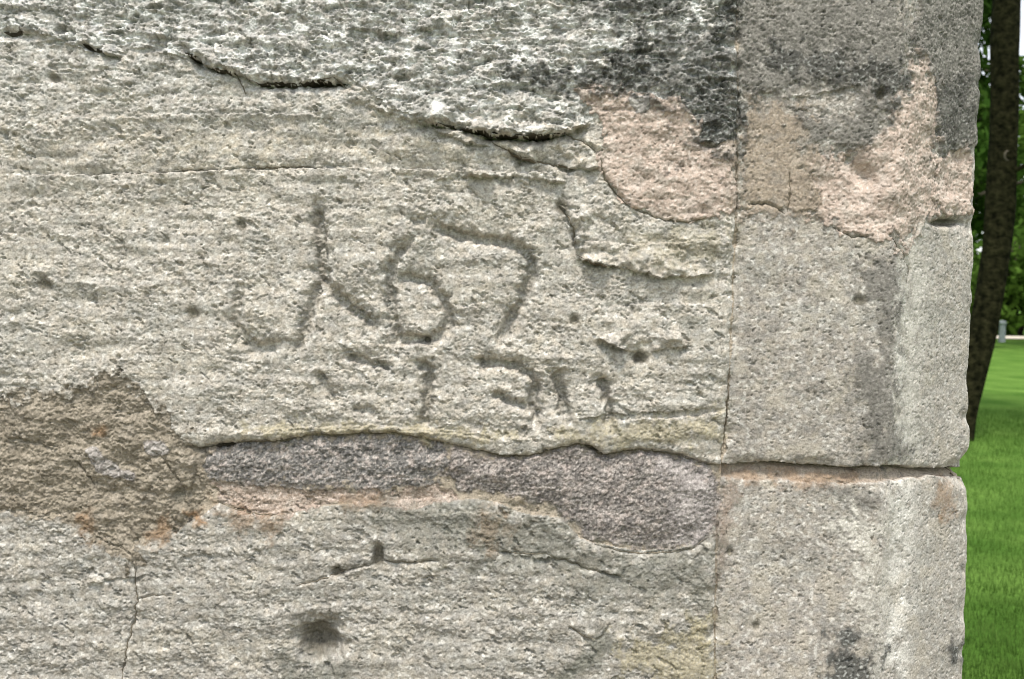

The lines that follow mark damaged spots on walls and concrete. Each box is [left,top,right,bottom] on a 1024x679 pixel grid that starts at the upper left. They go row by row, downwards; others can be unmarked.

crack [4,30,23,38]
crack [83,44,102,53]
crack [186,53,348,95]
flaking render [574,48,975,259]
crack [8,438,93,482]
spalling [0,368,724,578]
crack [97,537,172,678]